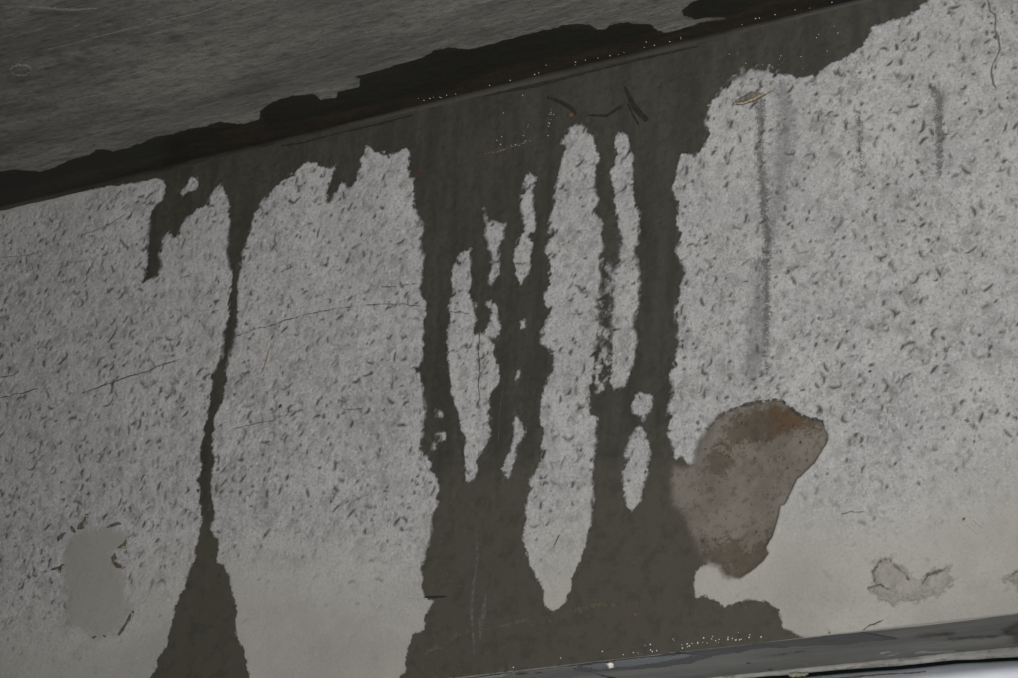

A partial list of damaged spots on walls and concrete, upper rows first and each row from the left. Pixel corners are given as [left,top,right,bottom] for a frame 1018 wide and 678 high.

water stain [0,0,852,206]
crack [485,45,698,96]
water stain [931,86,945,175]
crack [988,0,1001,88]
water stain [102,170,215,283]
water stain [150,0,927,678]